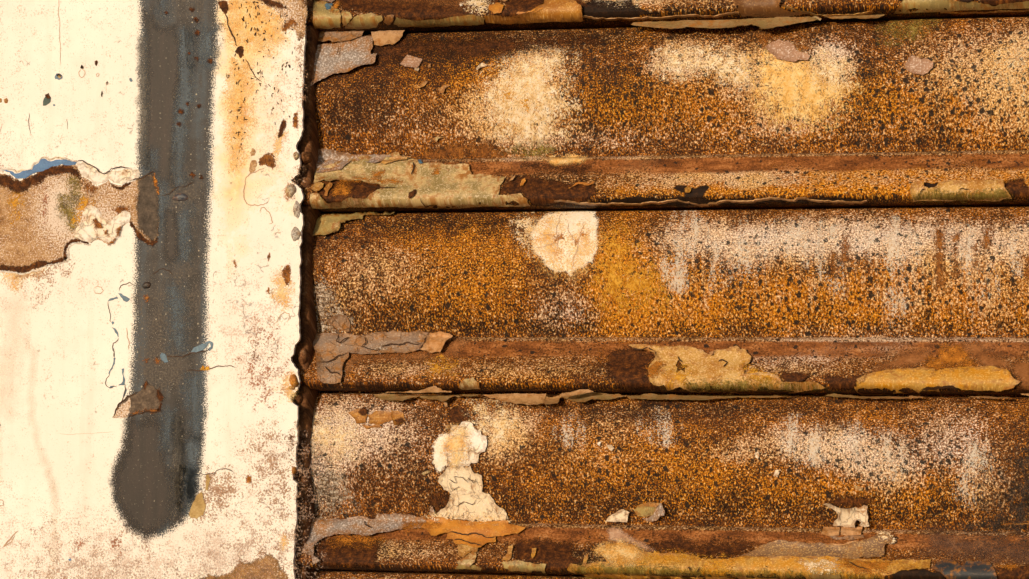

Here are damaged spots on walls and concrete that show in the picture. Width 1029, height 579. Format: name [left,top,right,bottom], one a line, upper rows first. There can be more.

corrosion [222,0,308,173]
peeling [310,30,405,86]
corrosion [411,139,866,207]
peeling [0,156,160,275]
peeling [310,148,599,278]
corrosion [602,345,660,395]
peeling [629,344,830,397]
peeling [303,377,547,579]
corrosion [513,538,583,573]
corrosion [648,532,759,559]
peeling [567,502,997,579]
corrosion [884,569,945,579]